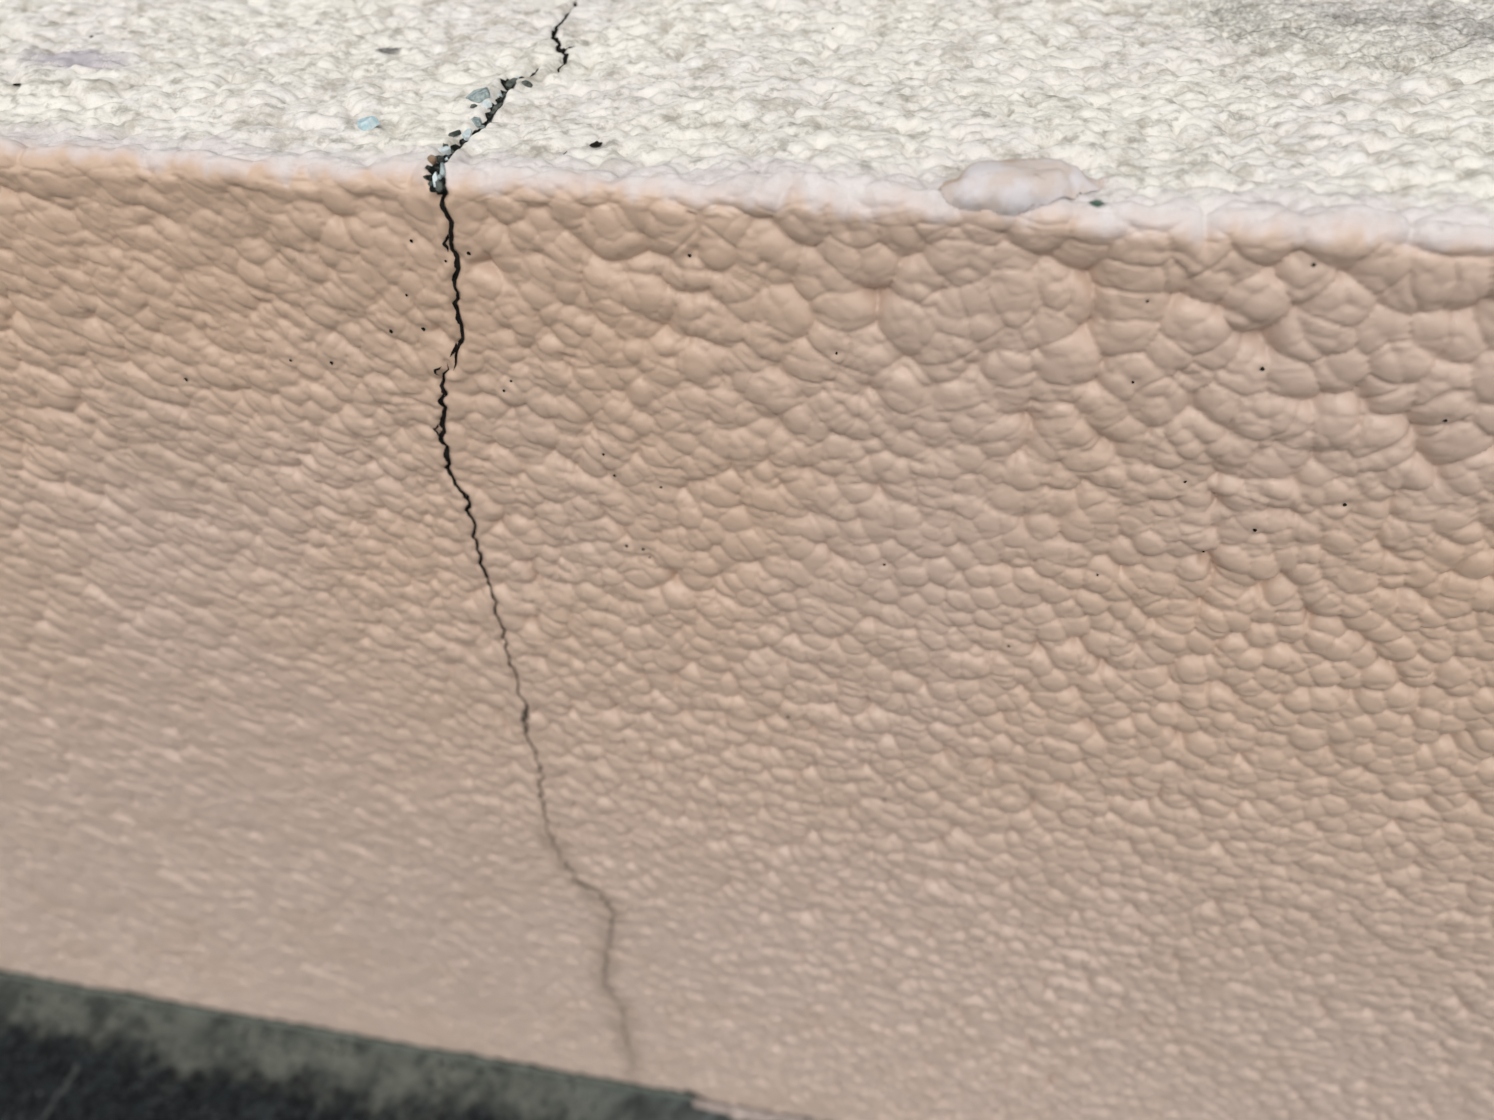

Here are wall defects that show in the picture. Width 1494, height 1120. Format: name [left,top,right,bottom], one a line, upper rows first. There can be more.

crack [423,2,633,1070]